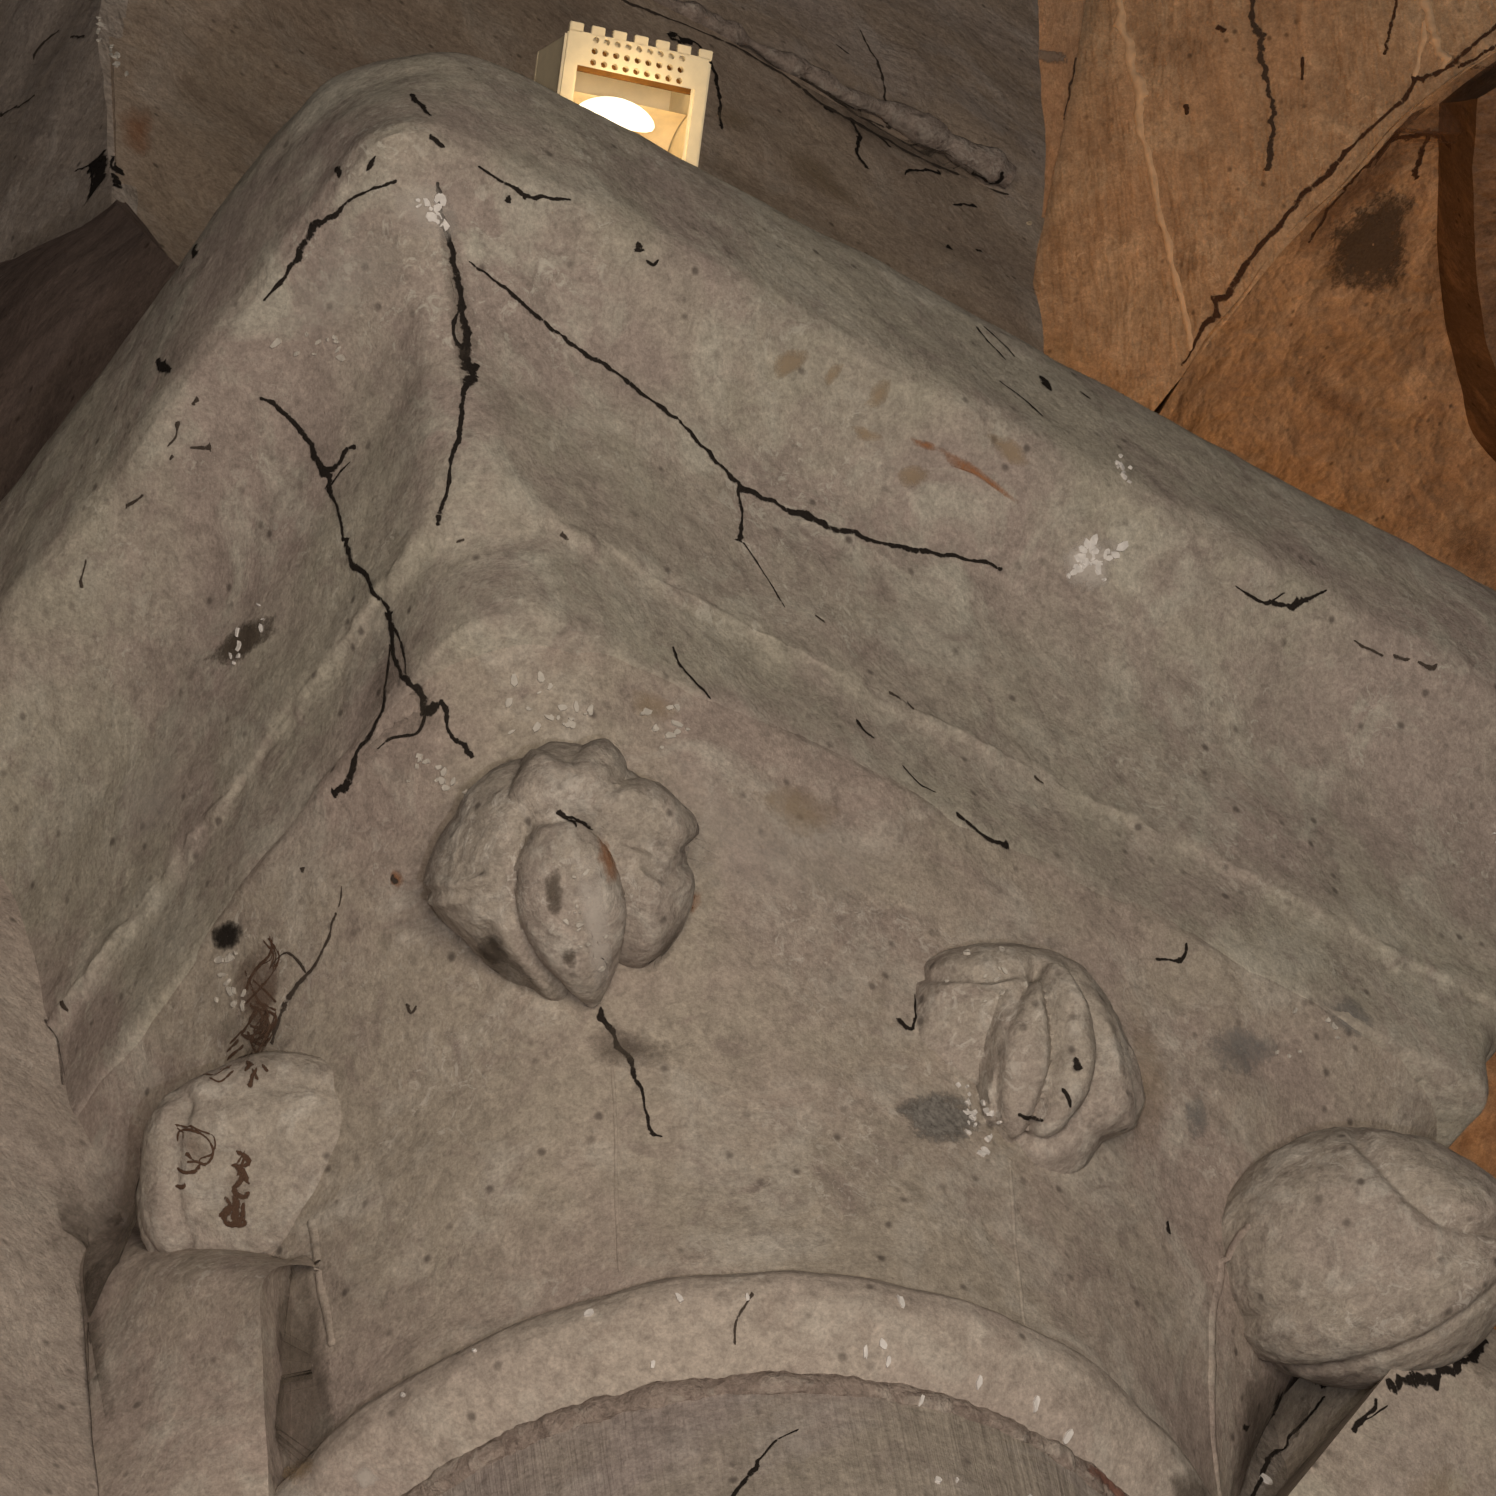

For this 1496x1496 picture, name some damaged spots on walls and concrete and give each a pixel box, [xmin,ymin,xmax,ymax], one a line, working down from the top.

crack [263,156,397,301]
crack [1181,0,1496,366]
crack [409,93,1003,622]
crack [259,397,474,798]
crack [596,1007,662,1137]
crack [731,1429,799,1496]
crack [1243,1384,1327,1496]
crack [1351,1339,1489,1433]